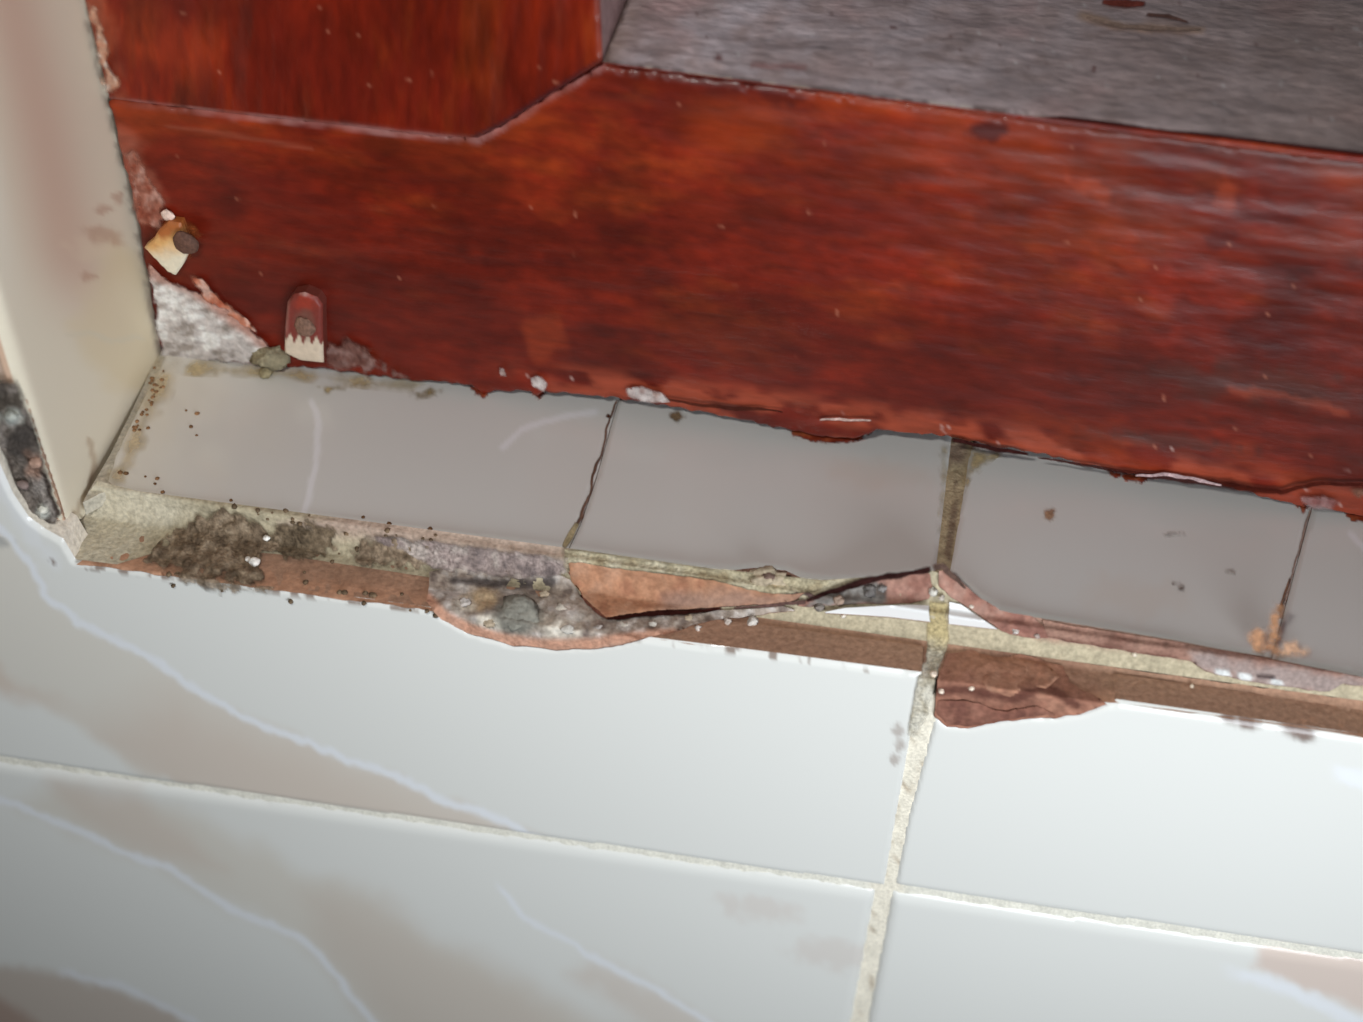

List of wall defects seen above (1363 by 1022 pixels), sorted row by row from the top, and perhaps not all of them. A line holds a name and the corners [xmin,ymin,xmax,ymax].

peeling [127,152,163,228]
peeling [149,265,268,364]
crack [563,401,966,620]
crack [952,438,1363,618]
spalling [375,537,1363,692]
spalling [930,650,1107,728]